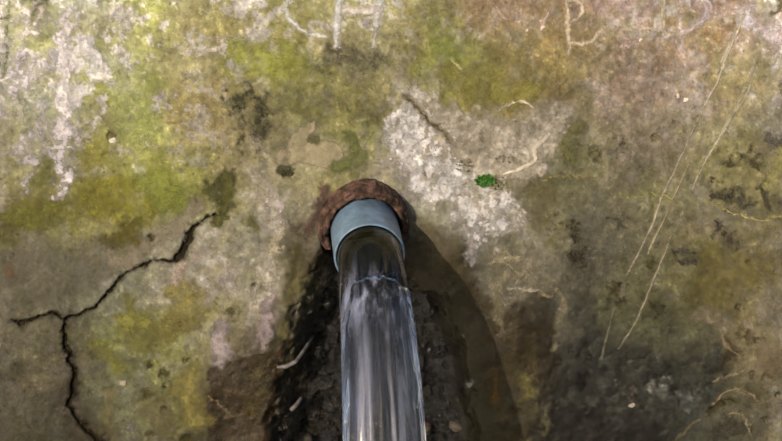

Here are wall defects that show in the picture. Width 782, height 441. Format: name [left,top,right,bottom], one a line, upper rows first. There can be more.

damp [220,84,278,158]
crack [12,213,216,441]
damp [207,164,285,441]